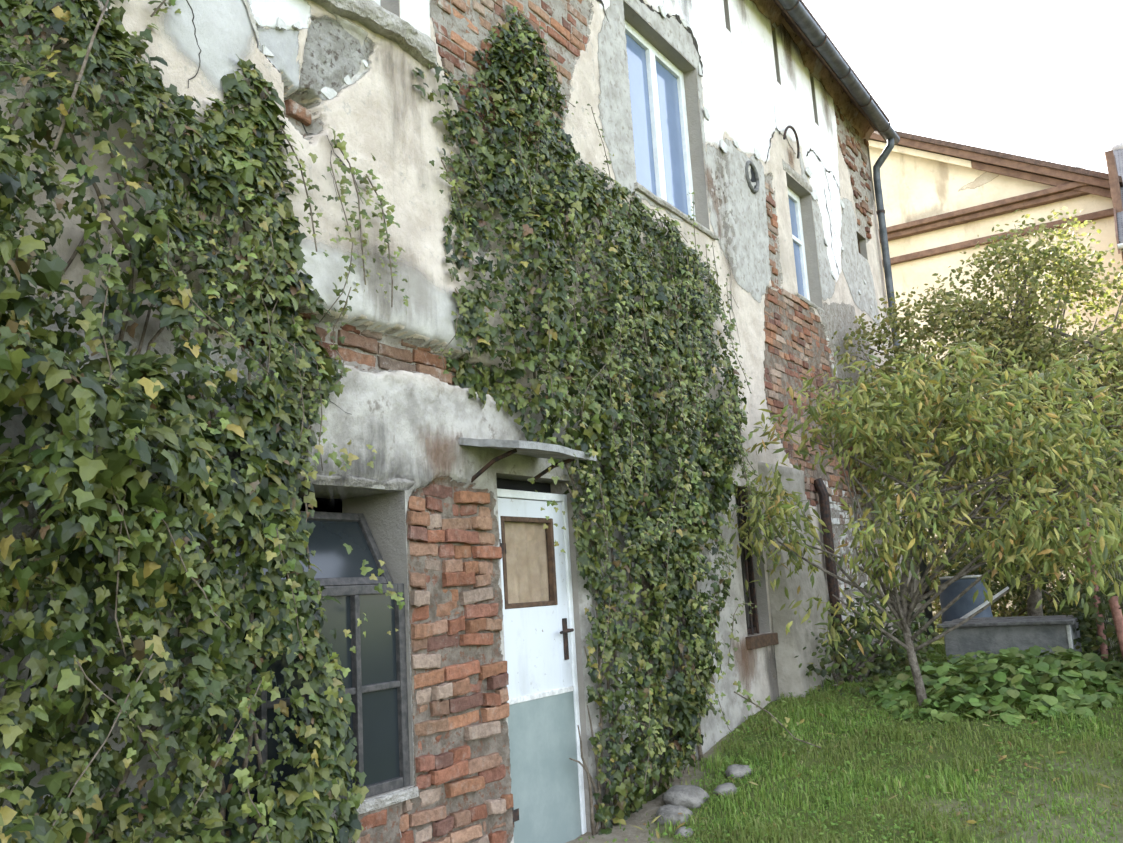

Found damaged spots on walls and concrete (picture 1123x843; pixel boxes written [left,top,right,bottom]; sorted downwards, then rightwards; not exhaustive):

crack [186,0,201,88]
spalling [243,0,374,144]
crack [639,0,703,77]
flaking render [234,299,506,398]
flaking render [430,0,891,662]